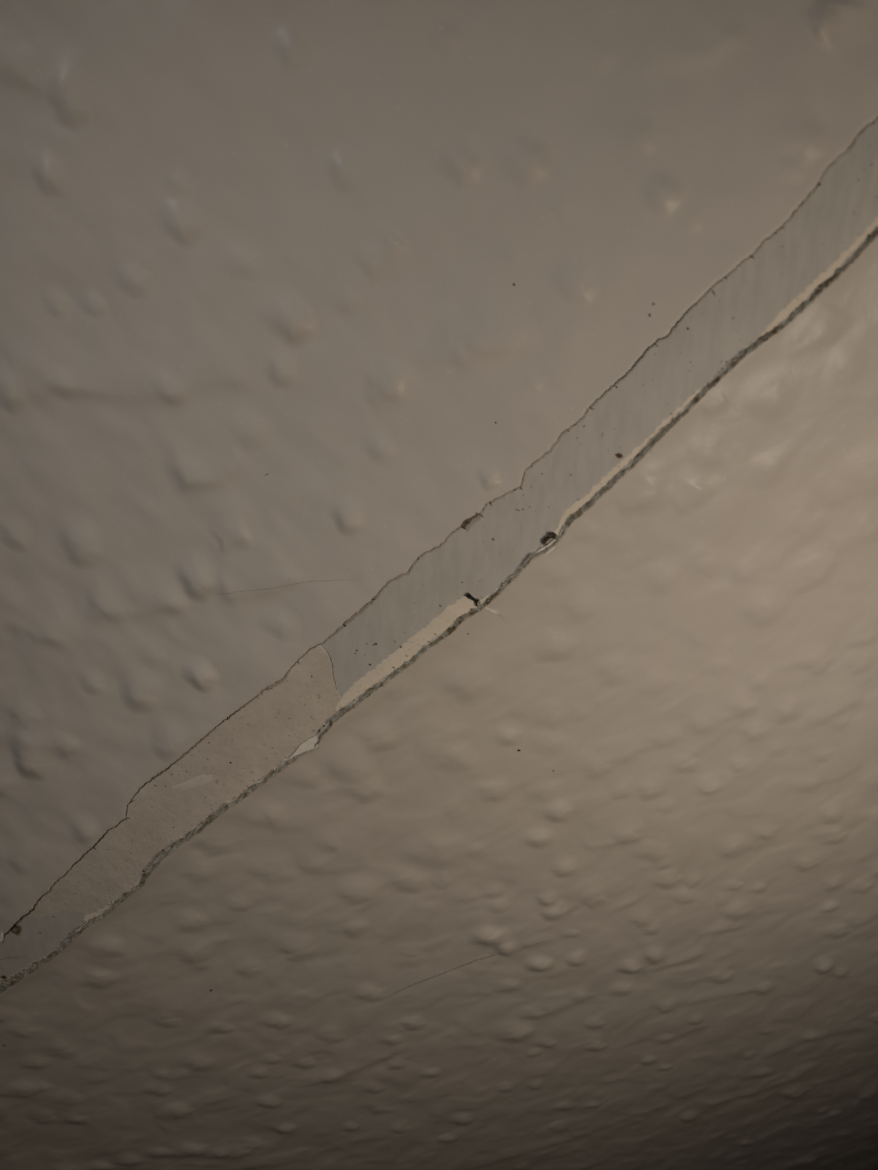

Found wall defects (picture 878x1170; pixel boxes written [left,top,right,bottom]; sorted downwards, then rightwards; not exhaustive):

peeling [0,119,878,994]
crack [3,117,878,938]